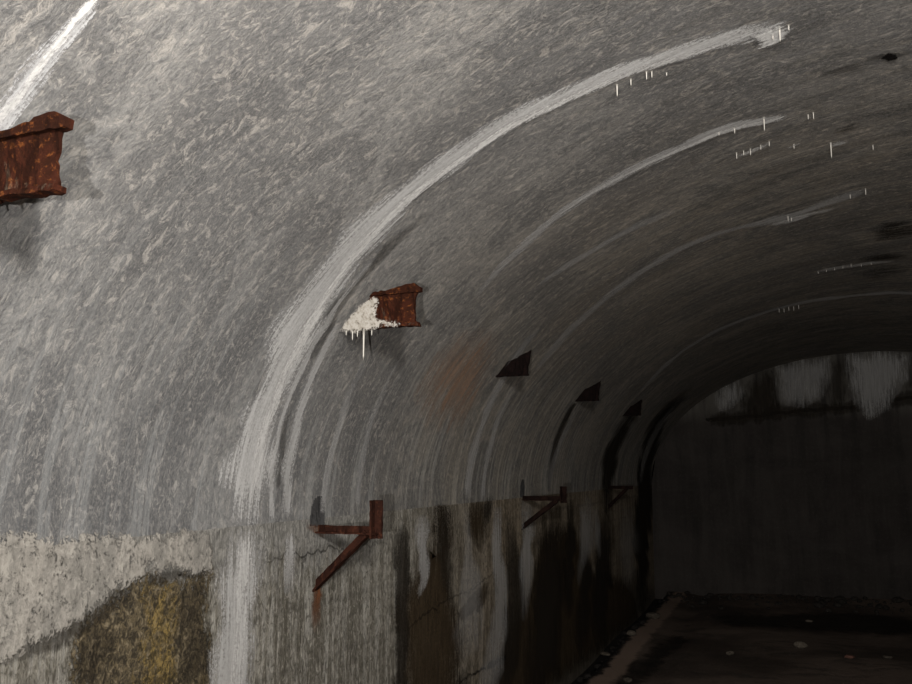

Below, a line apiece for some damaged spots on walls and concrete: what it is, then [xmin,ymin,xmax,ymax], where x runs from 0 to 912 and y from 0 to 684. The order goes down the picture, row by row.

damp [211,22,789,684]
damp [773,207,816,225]